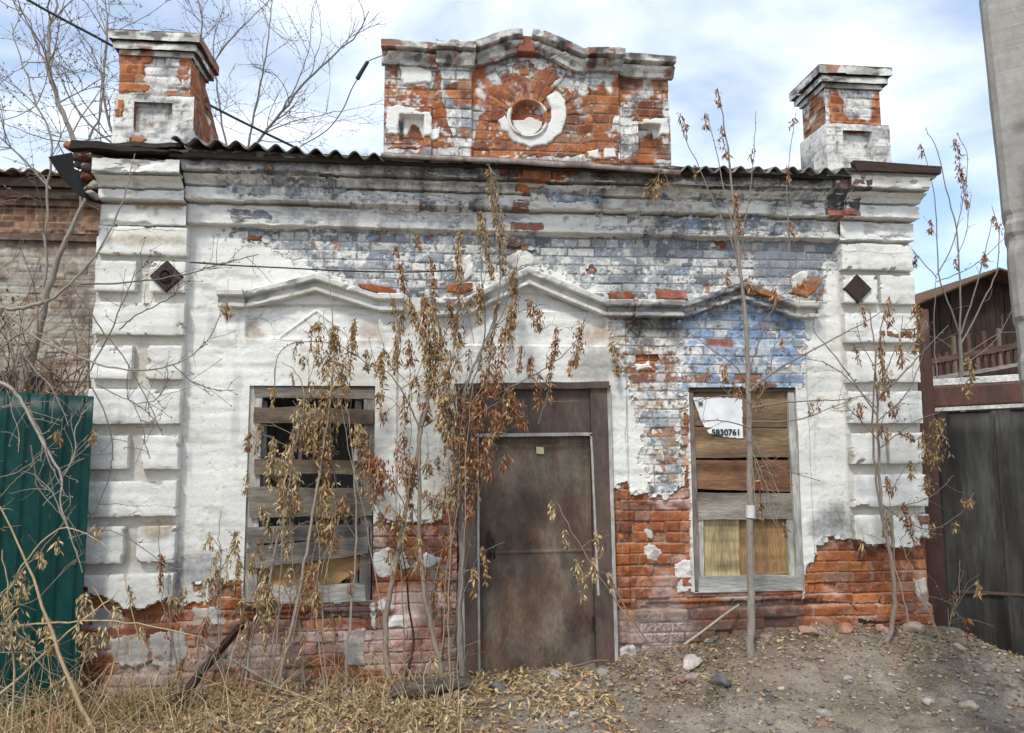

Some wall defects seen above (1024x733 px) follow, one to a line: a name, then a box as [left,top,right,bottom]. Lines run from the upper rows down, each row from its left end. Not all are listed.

flaking render [114,54,153,117]
flaking render [177,58,192,83]
peeling [213,59,935,657]
flaking render [78,500,457,705]